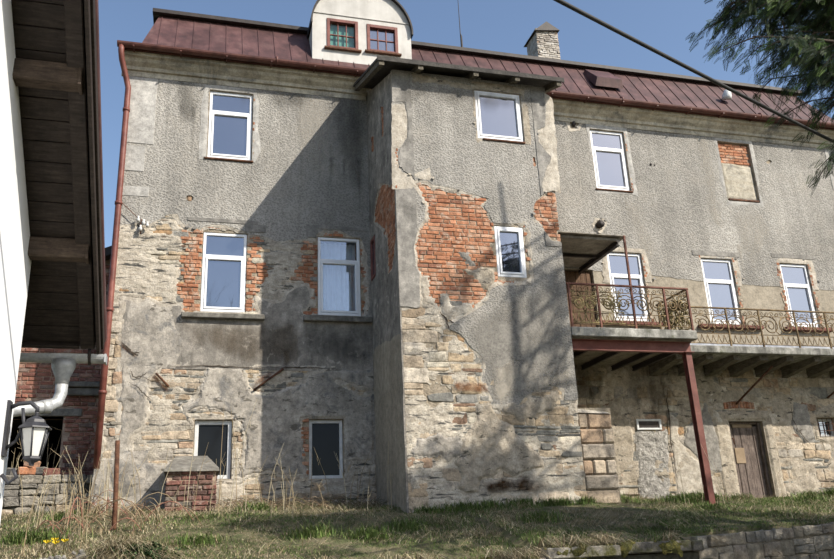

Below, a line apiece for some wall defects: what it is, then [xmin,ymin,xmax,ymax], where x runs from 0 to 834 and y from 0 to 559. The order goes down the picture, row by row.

spalling [101,214,376,505]
spalling [371,72,588,513]
flaking render [718,143,751,166]